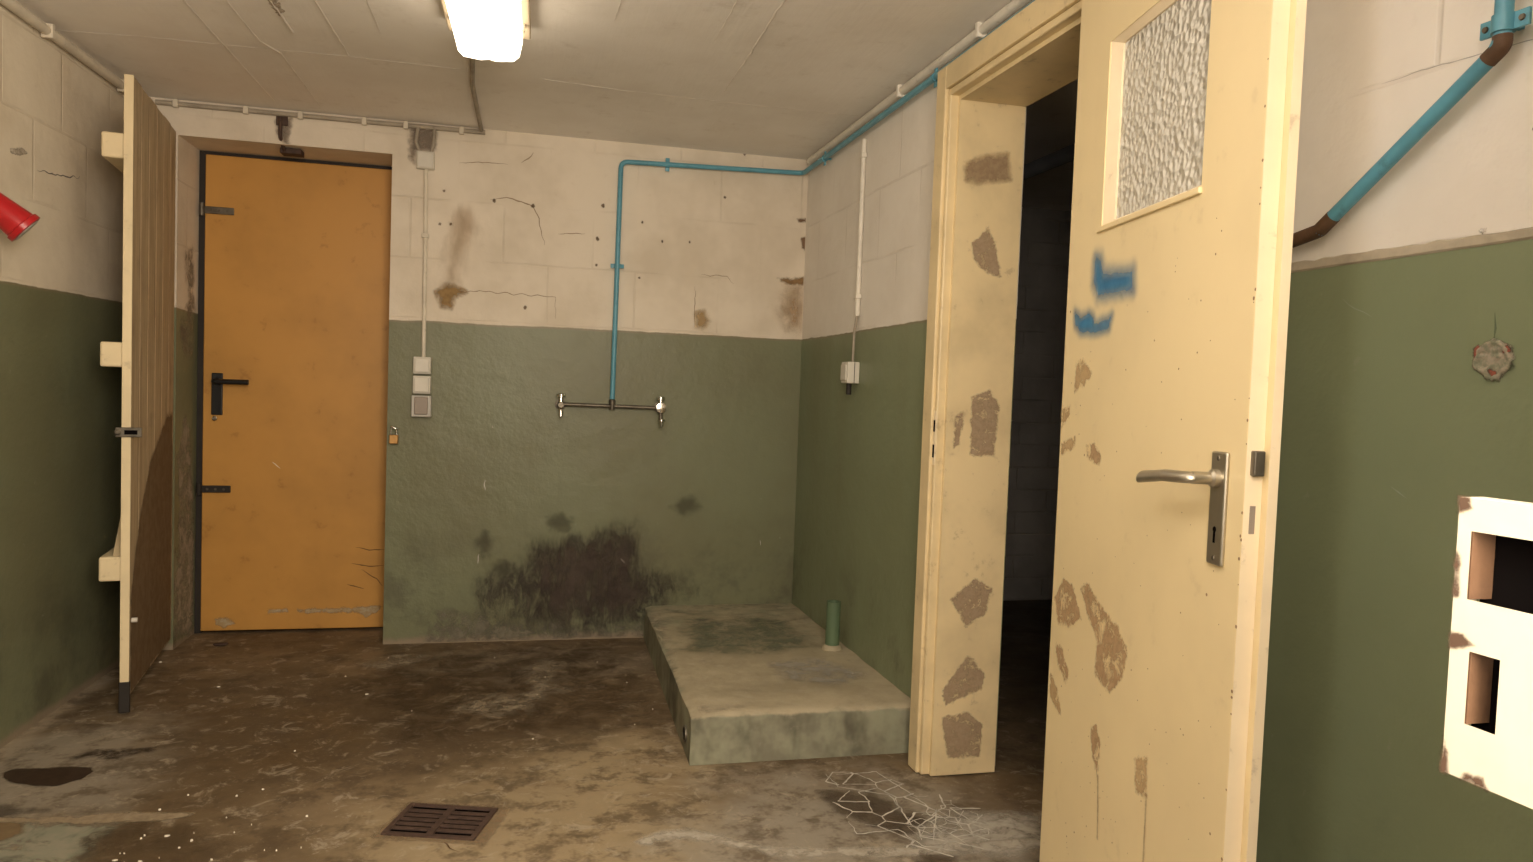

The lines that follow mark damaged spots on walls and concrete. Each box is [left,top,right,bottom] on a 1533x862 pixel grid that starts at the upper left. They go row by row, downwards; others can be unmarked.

crack [1386,39,1533,83]
spalling [1472,317,1515,382]
damp [373,530,675,738]
crack [638,771,1041,857]